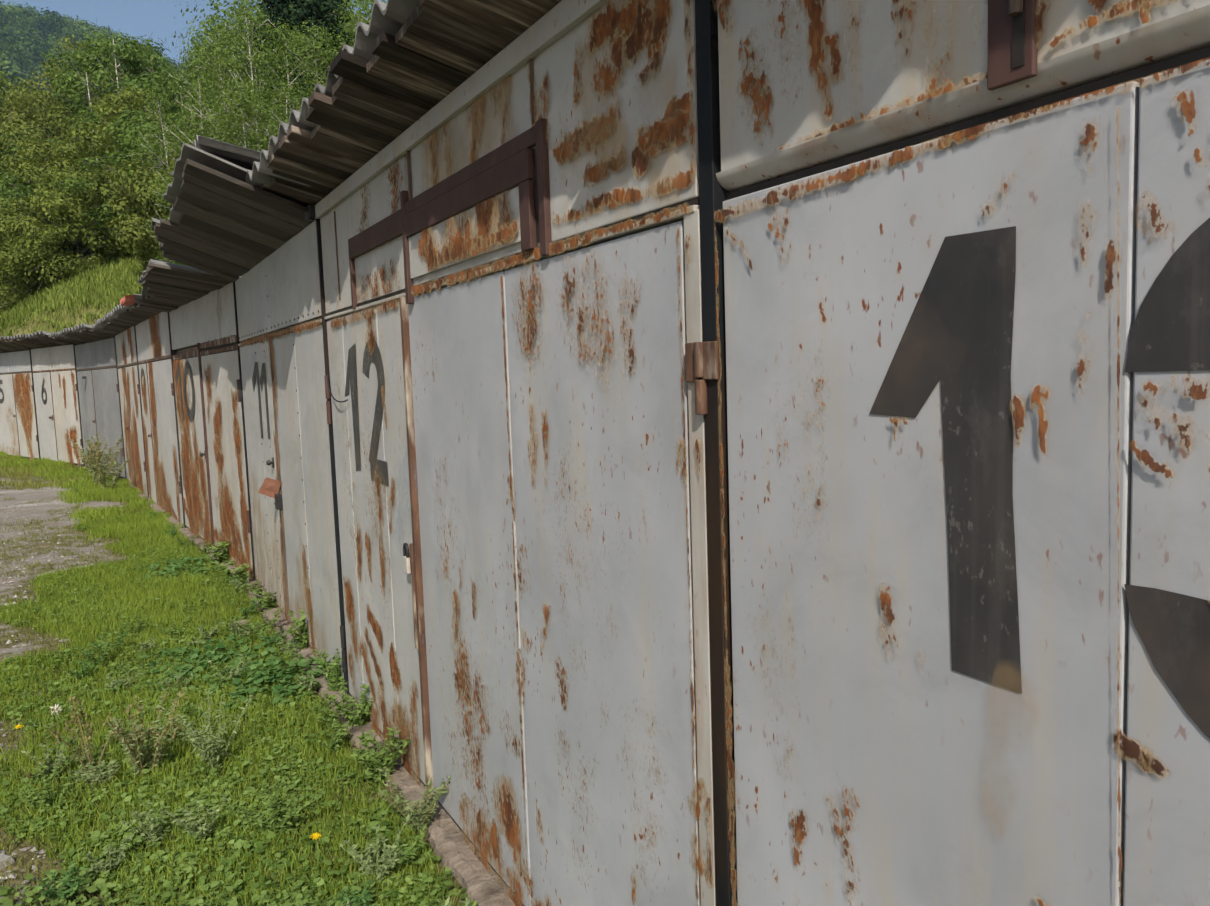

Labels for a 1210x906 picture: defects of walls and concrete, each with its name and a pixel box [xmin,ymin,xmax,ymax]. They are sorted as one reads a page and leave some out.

corrosion [738,35,797,145]
corrosion [773,0,987,150]
corrosion [715,57,1210,294]
corrosion [224,0,695,635]
corrosion [13,373,34,461]
corrosion [1012,385,1049,454]
corrosion [441,548,551,906]
corrosion [556,657,568,710]
corrosion [690,683,712,899]
corrosion [790,810,807,866]
corrosion [826,789,859,901]
corrosion [1114,730,1169,898]